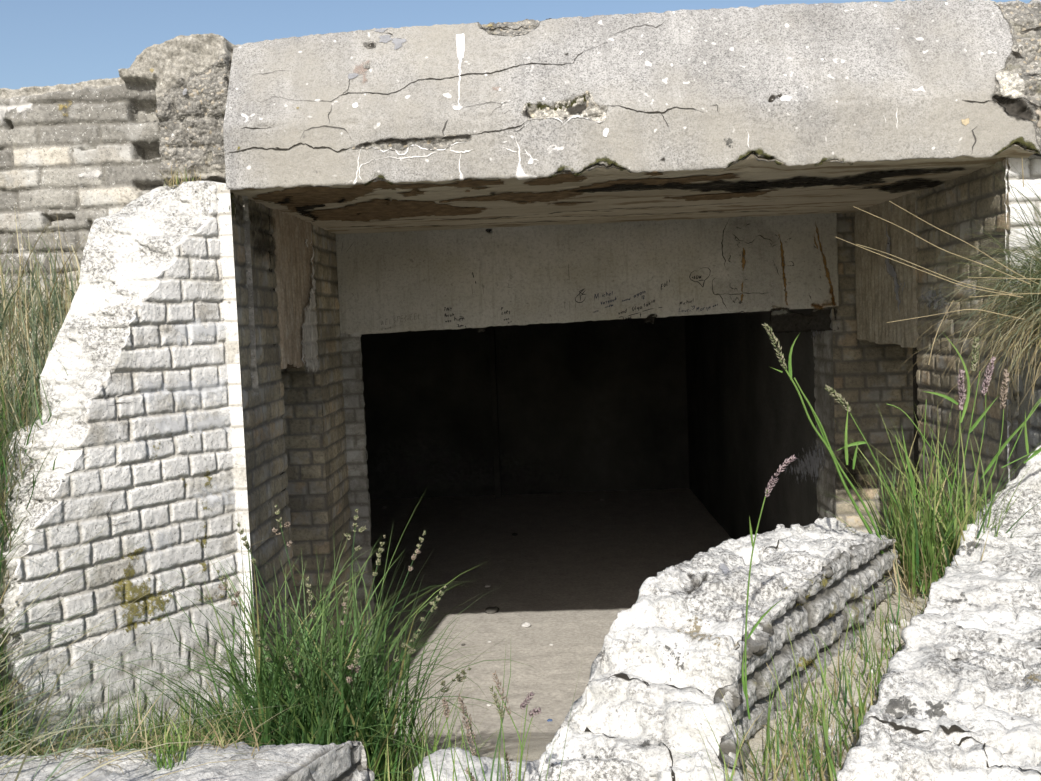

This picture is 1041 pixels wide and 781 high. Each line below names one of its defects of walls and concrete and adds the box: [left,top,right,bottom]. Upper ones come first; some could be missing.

spalling [478,18,552,37]
spalling [156,54,232,170]
crack [227,21,665,154]
spalling [521,91,607,123]
crack [607,104,718,125]
spalling [992,2,1041,155]
leakage [353,149,435,185]
leakage [503,137,538,180]
rust [779,236,788,305]
rust [811,221,836,309]